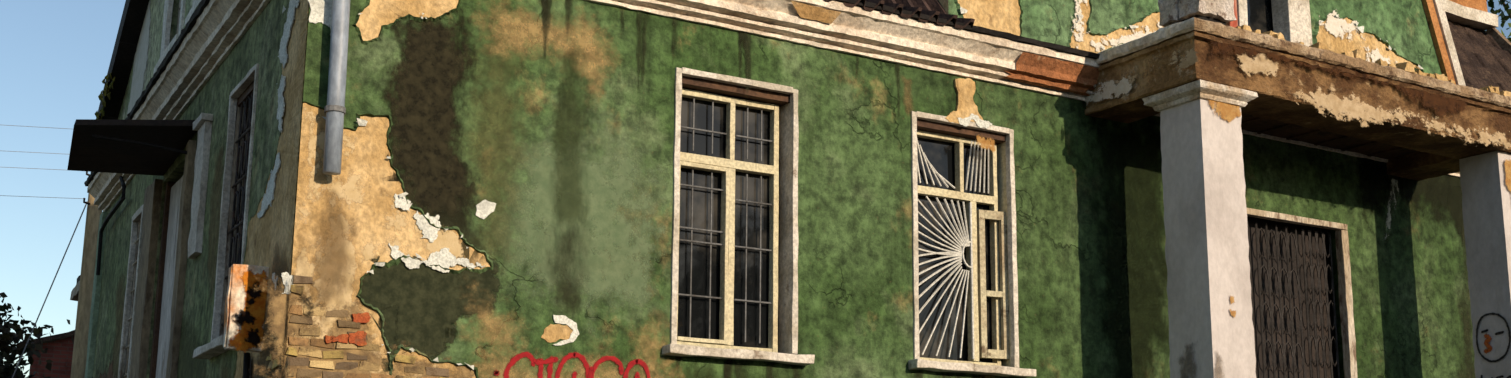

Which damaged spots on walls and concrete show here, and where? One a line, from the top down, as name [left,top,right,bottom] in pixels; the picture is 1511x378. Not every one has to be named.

peeling [500,14,603,69]
flaking render [945,78,992,129]
flaking render [233,0,535,378]
leakage [316,14,502,372]
flaking render [541,315,579,346]